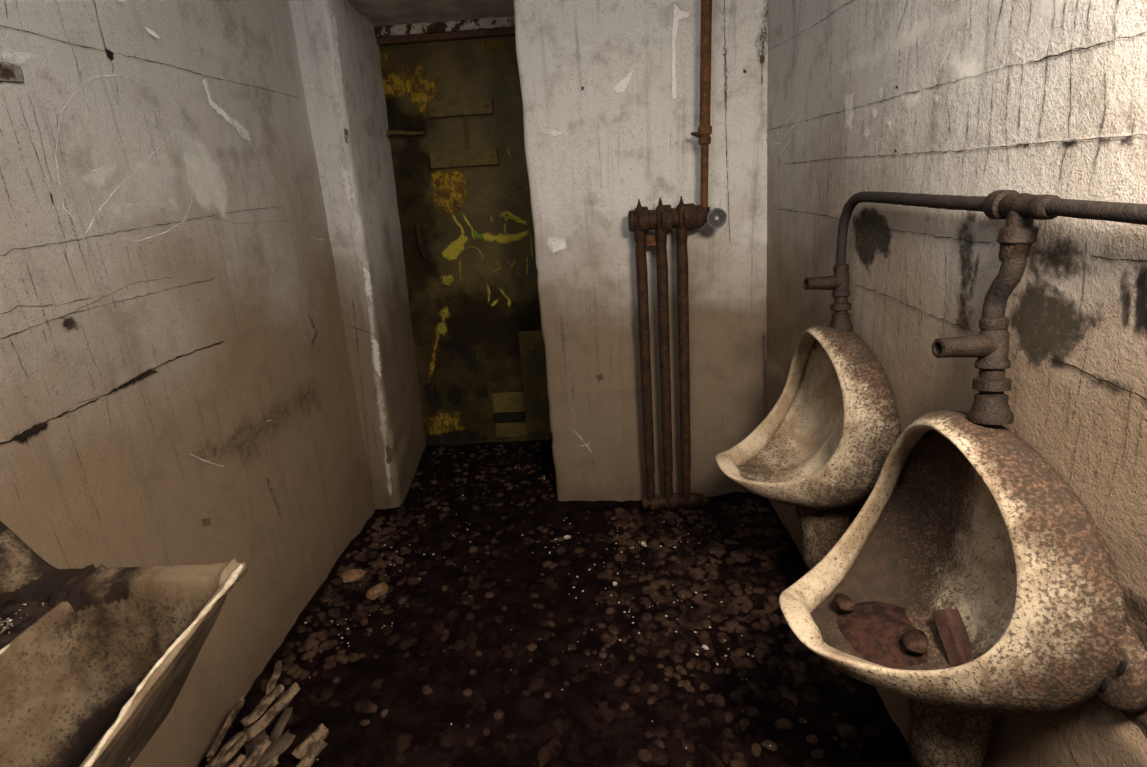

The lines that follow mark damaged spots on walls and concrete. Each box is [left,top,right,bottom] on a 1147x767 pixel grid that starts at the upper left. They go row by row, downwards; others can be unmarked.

crack [0,0,333,98]
crack [771,31,1147,129]
crack [787,134,1147,164]
crack [0,277,214,339]
crack [1,207,307,256]
leakage [853,208,891,269]
crack [893,230,991,243]
leakage [943,214,979,330]
leakage [1011,235,1095,366]
crack [1091,254,1147,262]
leakage [1121,272,1147,333]
crack [0,341,224,519]